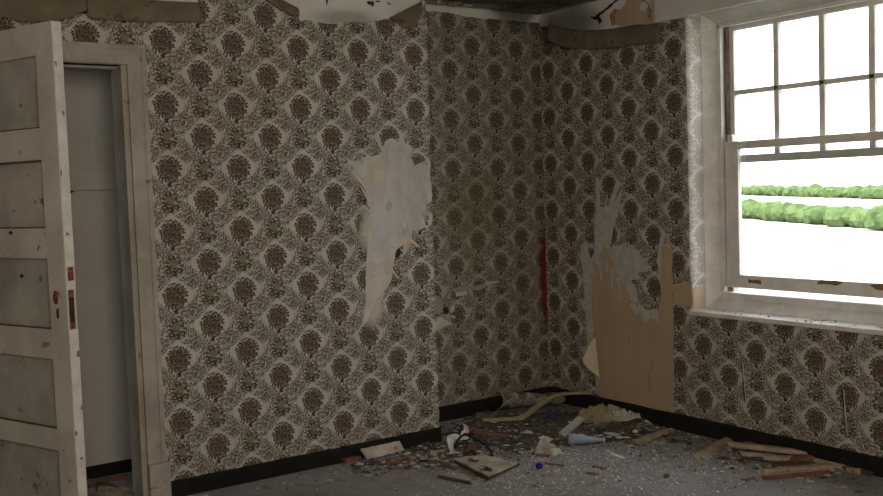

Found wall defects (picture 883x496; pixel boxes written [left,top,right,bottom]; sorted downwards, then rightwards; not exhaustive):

peeling [421,0,598,15]
peeling [347,135,432,329]
peeling [580,177,706,411]